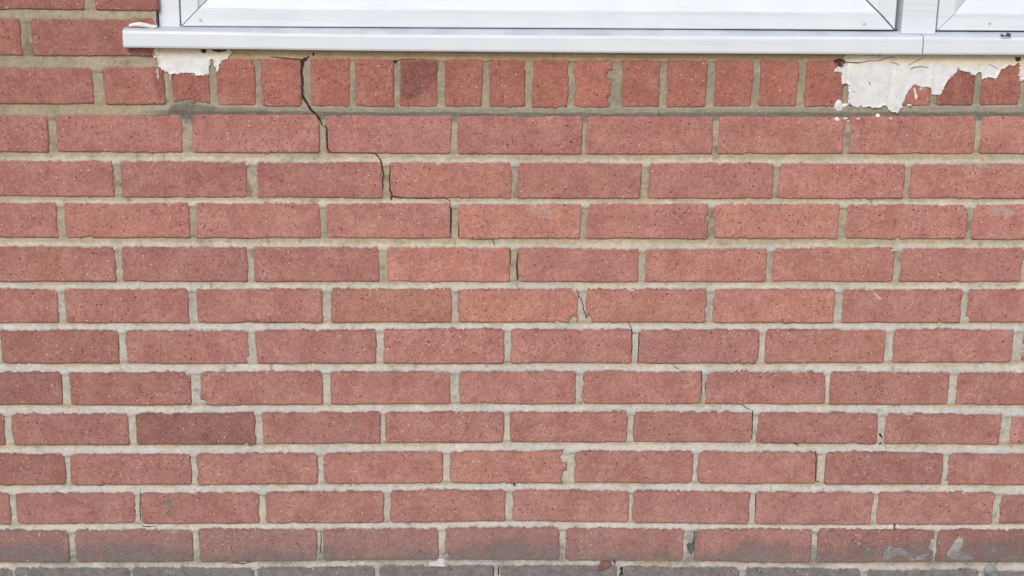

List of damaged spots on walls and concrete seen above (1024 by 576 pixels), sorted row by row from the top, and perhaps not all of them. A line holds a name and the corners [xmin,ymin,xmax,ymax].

peeling [153,48,232,80]
peeling [834,54,1024,113]
crack [273,56,459,242]
crack [492,239,519,289]